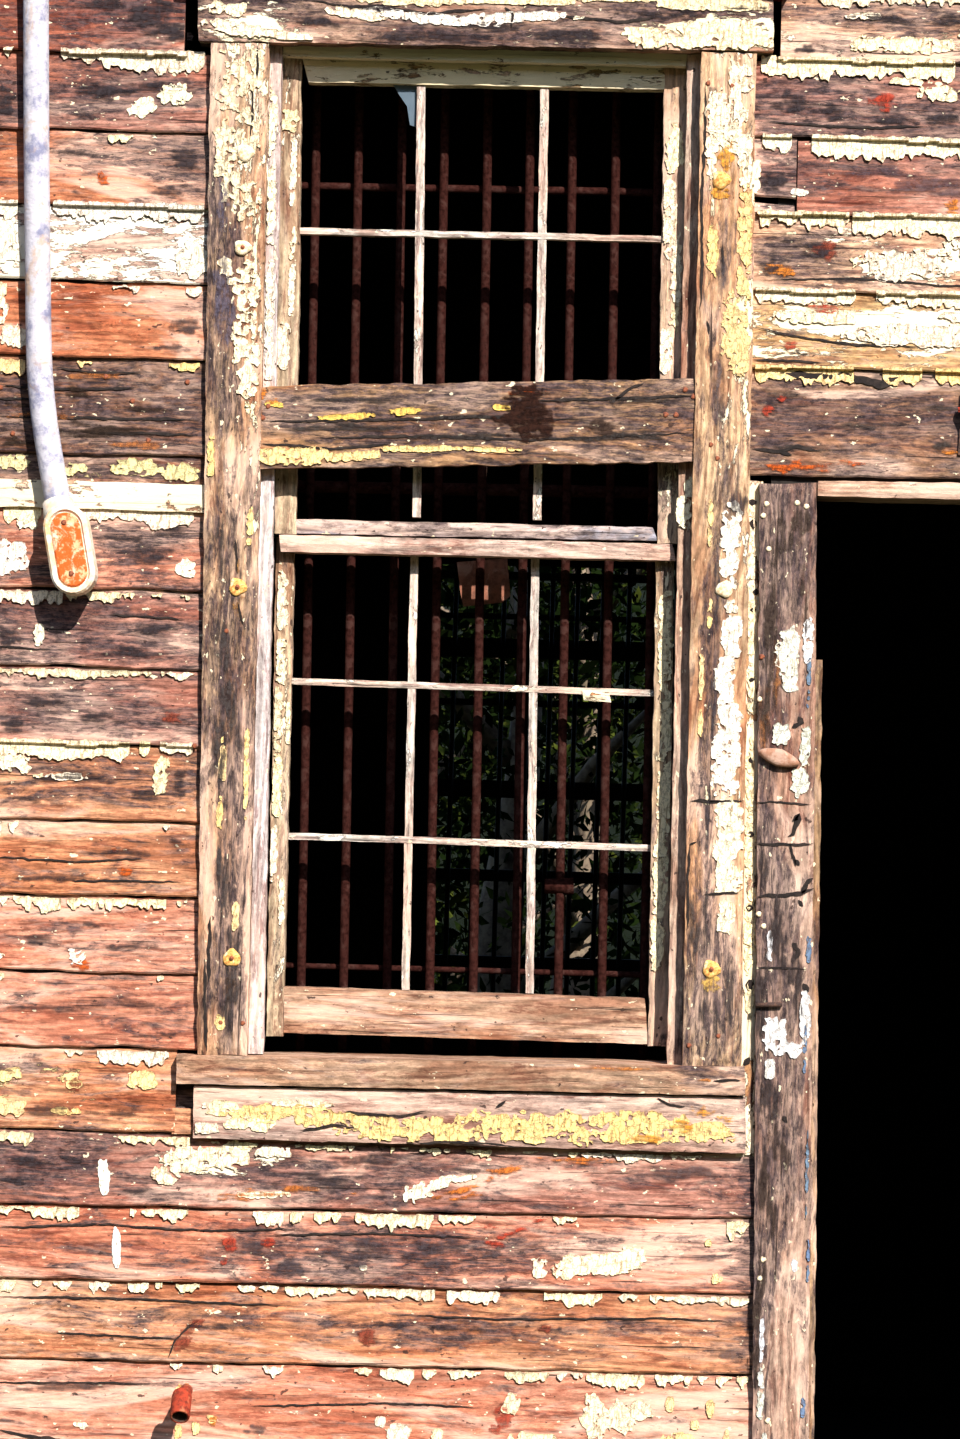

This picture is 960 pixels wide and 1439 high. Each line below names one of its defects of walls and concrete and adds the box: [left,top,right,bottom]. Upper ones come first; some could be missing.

peeling [53,0,313,408]
peeling [324,0,960,387]
peeling [260,445,523,466]
corrosion [492,384,559,442]
peeling [0,507,162,605]
peeling [675,476,756,579]
peeling [0,738,193,795]
peeling [698,598,814,1079]
peeling [119,1099,755,1185]
peeling [238,1174,477,1232]
peeling [238,1285,500,1305]
peeling [501,1318,767,1439]